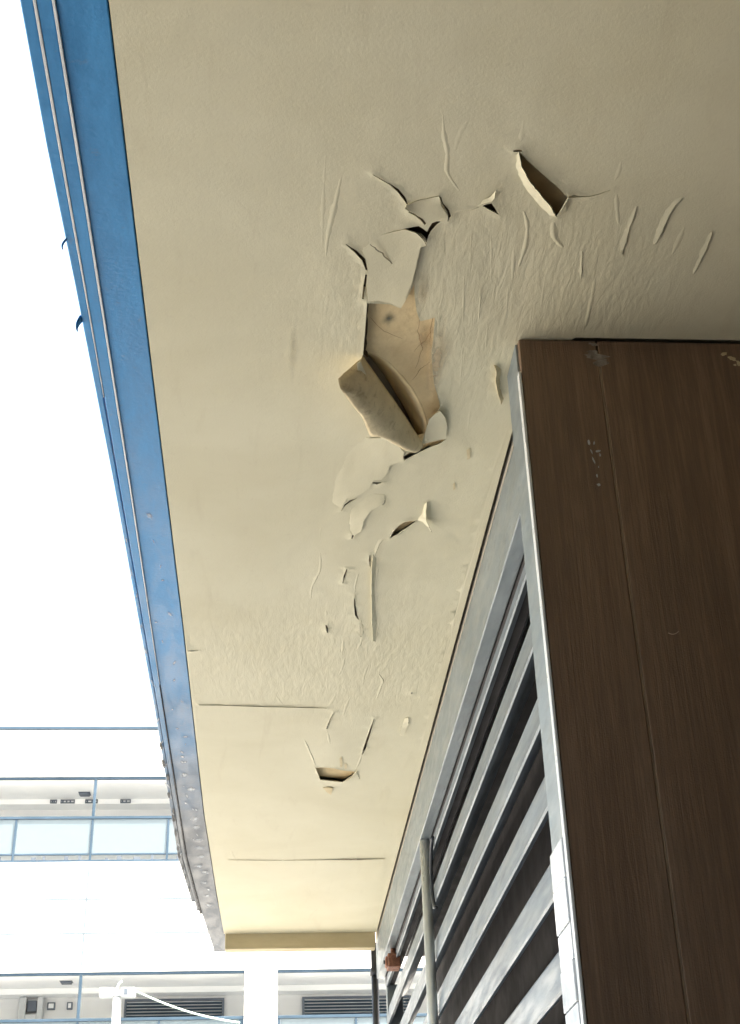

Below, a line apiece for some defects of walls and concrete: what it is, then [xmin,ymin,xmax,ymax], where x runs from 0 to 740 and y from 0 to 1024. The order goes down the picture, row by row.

peeling [514,118,606,248]
peeling [332,229,448,508]
peeling [494,365,504,404]
peeling [374,503,432,556]
peeling [304,740,362,795]